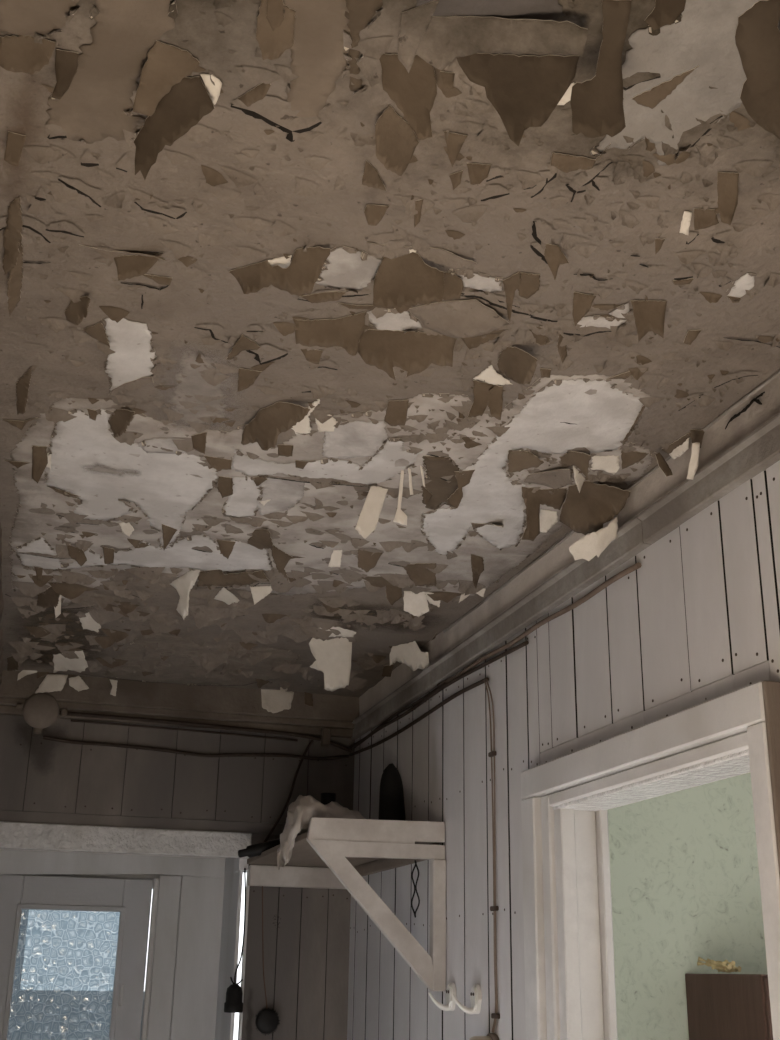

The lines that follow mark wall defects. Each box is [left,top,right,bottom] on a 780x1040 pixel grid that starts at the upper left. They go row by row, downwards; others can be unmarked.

flaking render [0,0,780,713]